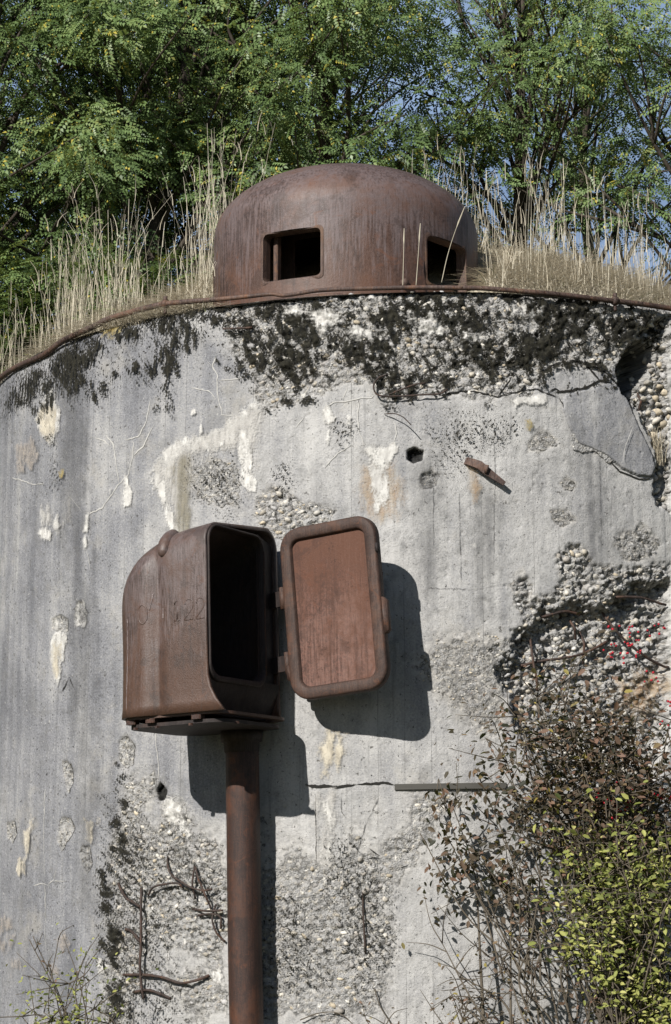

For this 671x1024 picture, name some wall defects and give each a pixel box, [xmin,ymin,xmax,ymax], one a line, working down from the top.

water stain [35,390,61,445]
water stain [149,401,266,532]
spalling [254,485,337,540]
spalling [221,291,671,513]
crack [438,360,655,521]
spalling [412,527,671,779]
spalling [95,736,228,1024]
crack [307,781,408,904]
spalling [261,789,470,1024]